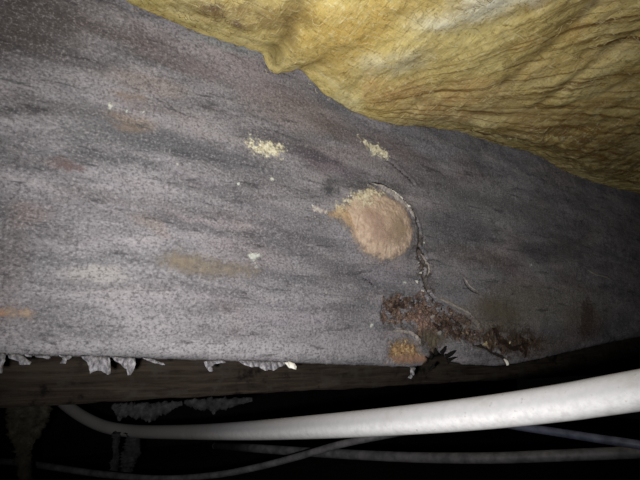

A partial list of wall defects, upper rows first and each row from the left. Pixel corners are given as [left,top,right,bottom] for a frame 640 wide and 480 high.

spalling [312,182,417,260]
crack [414,222,475,321]
corrosion [389,340,426,363]
corrosion [462,325,542,366]
peeling [0,353,50,374]
peeling [80,355,166,375]
peeling [204,360,226,372]
peeling [237,360,297,371]